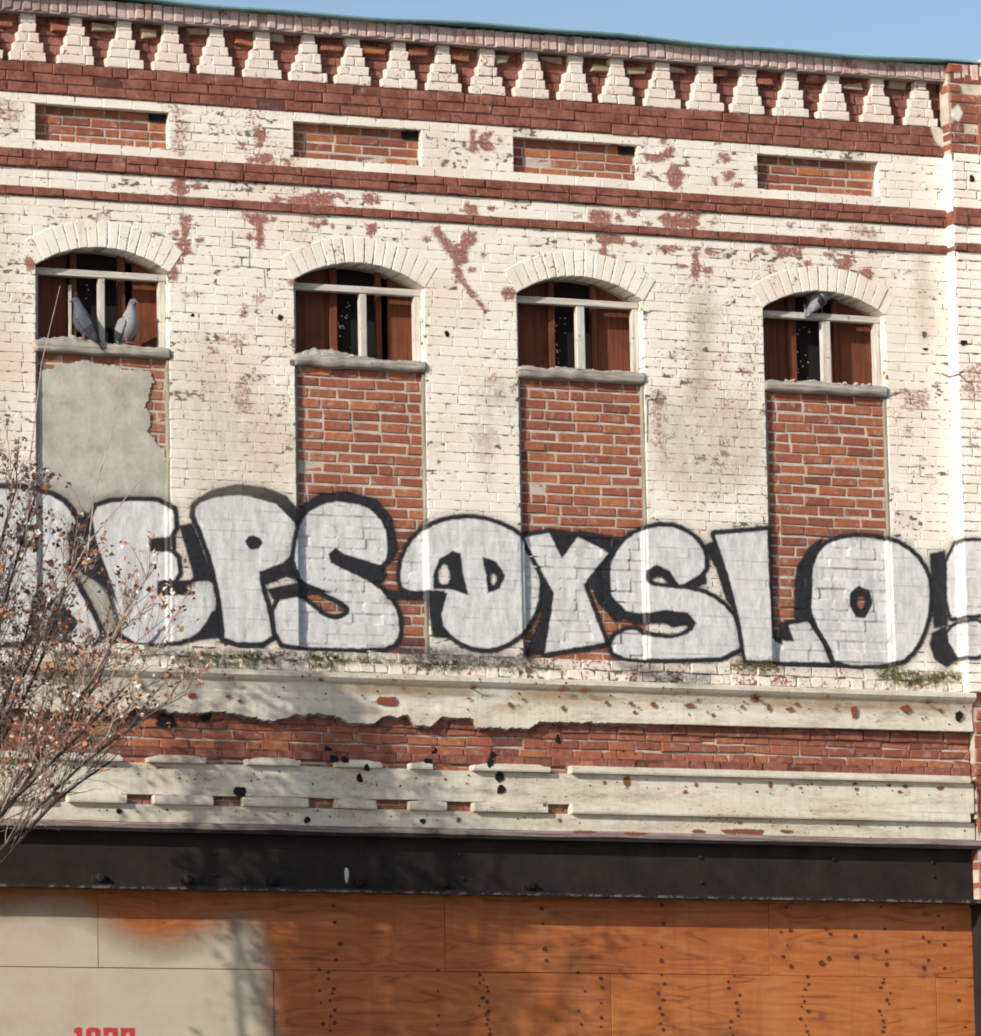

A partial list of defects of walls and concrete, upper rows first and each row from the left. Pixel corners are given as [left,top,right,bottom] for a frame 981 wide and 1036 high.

peeling [237,124,292,166]
peeling [618,136,690,189]
peeling [711,139,744,186]
peeling [171,213,204,280]
peeling [243,212,276,249]
peeling [269,190,345,230]
peeling [364,222,377,246]
peeling [361,191,381,208]
peeling [424,226,487,311]
peeling [451,202,495,216]
peeling [578,209,718,262]
peeling [754,222,873,279]